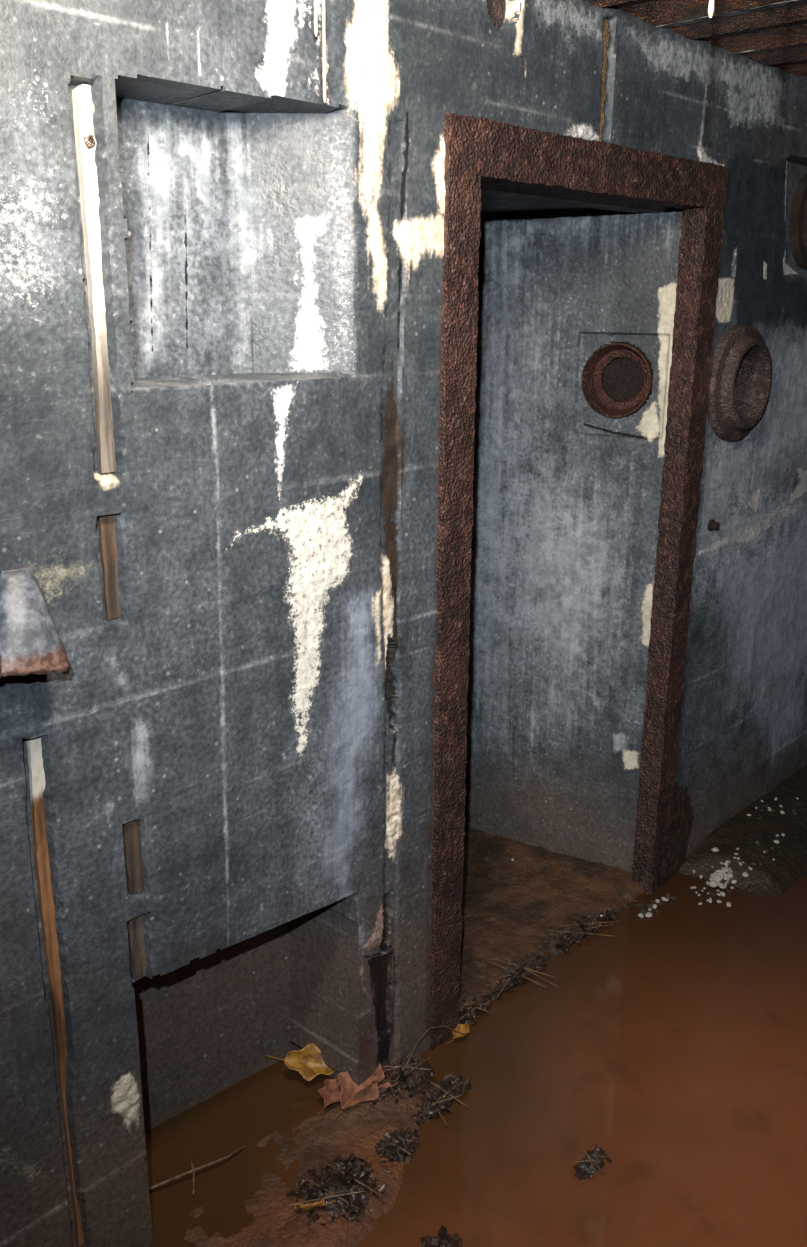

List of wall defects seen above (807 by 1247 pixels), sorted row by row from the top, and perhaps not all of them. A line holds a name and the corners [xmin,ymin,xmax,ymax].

rust [599,19,610,141]
leakage [217,0,446,756]
peeling [696,466,807,556]